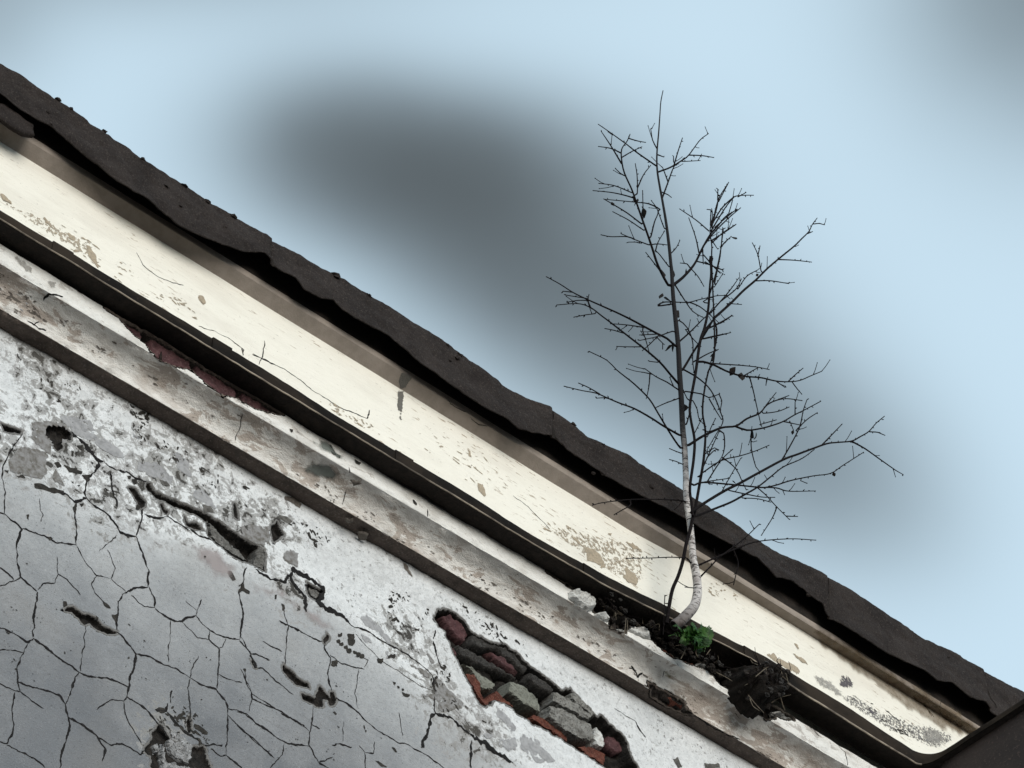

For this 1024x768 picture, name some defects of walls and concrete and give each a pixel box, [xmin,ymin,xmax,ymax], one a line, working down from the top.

peeling [1,194,101,268]
peeling [0,288,47,324]
crack [200,326,370,419]
peeling [0,416,124,495]
spalling [127,404,330,594]
peeling [420,428,507,496]
spalling [45,601,131,636]
crack [0,431,513,768]
spalling [305,580,326,602]
peeling [543,523,647,585]
spalling [321,591,640,768]